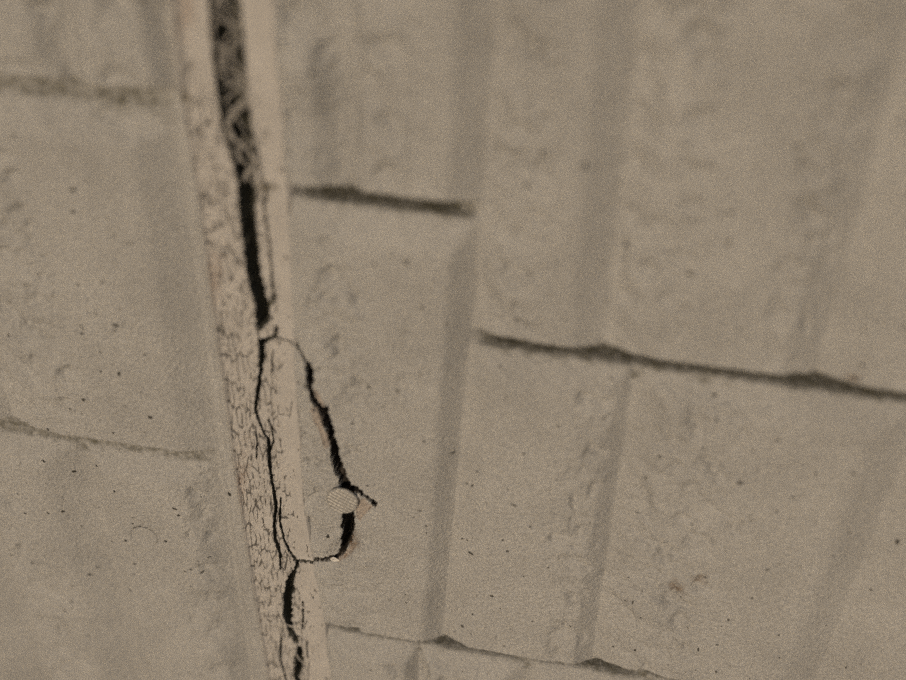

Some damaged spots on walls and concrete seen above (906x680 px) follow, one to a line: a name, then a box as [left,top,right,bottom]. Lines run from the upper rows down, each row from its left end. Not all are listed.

crack [182,61,377,680]